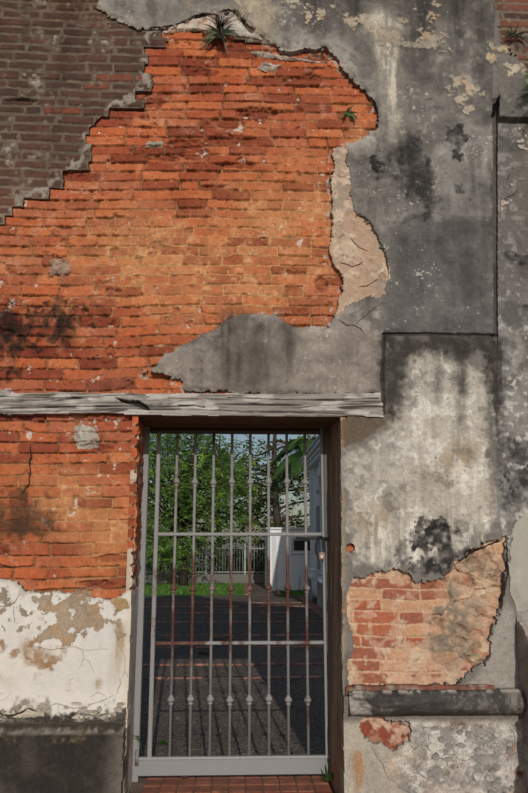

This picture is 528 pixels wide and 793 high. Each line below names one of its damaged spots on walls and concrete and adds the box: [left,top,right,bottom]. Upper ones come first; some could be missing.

damp [366,10,403,133]
peeling [343,1,453,58]
spalling [0,12,391,394]
damp [370,135,432,219]
damp [0,297,87,361]
damp [379,332,528,505]
crack [20,445,32,499]
spalling [0,414,142,646]
damp [409,516,472,574]
spalling [347,535,507,685]
crack [0,630,128,717]
spalling [360,716,500,772]